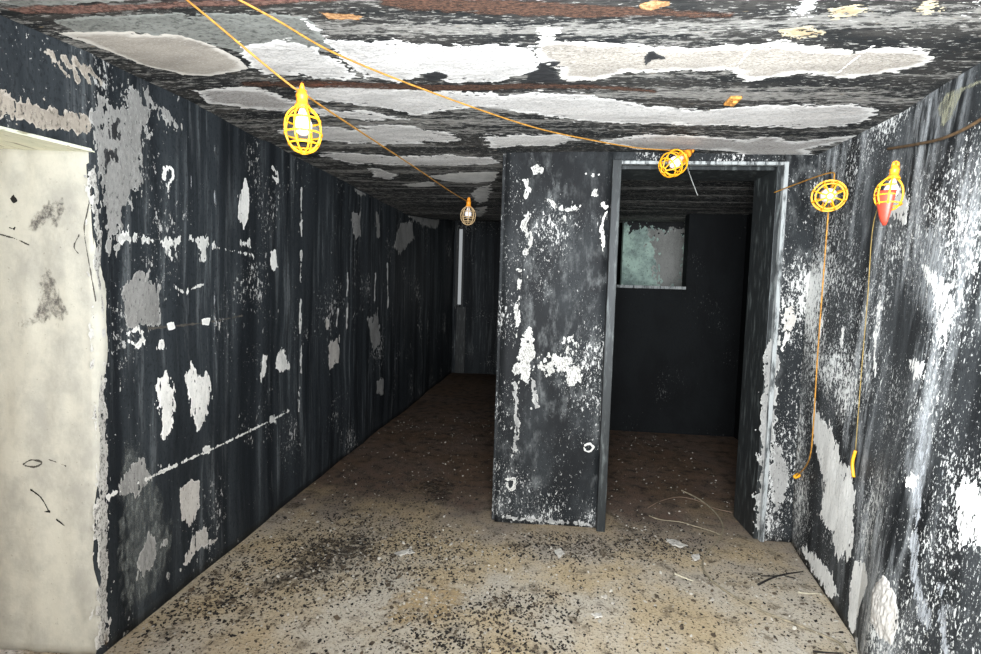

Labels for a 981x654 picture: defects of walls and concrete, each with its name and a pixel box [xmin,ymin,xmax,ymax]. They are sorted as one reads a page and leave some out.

corrosion [3,0,362,20]
corrosion [381,0,734,18]
peeling [54,0,934,217]
peeling [237,178,249,230]
peeling [0,49,183,650]
peeling [154,361,213,440]
peeling [260,347,290,382]
peeling [511,268,585,458]
peeling [752,306,799,533]
peeling [166,479,218,580]
peeling [802,399,868,654]
peeling [952,469,981,551]